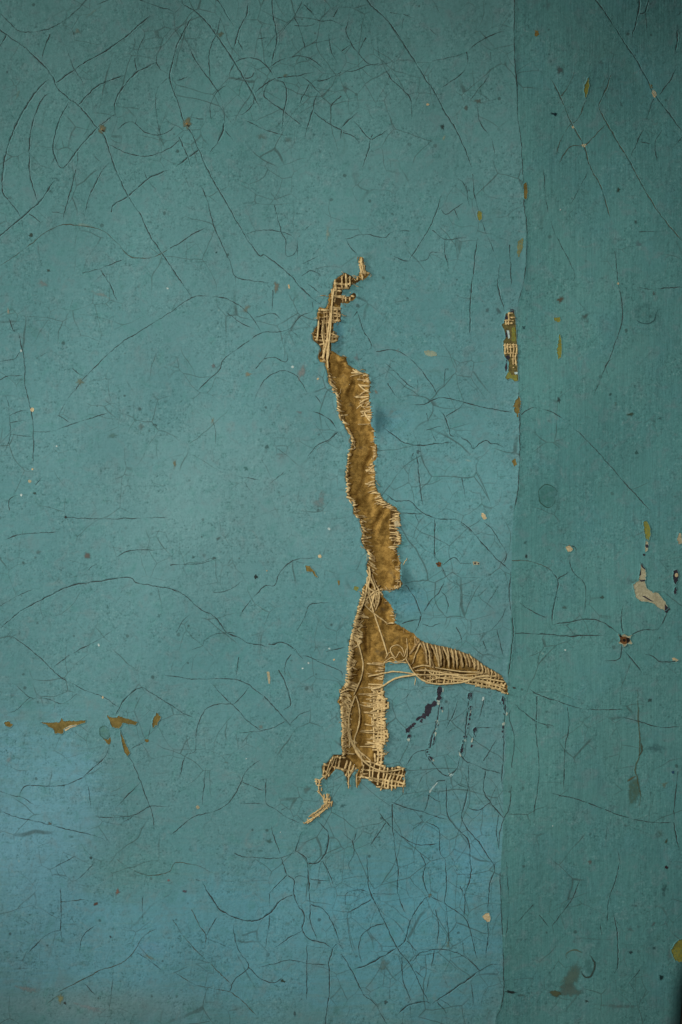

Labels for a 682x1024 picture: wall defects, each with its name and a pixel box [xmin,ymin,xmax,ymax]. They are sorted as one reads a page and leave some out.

crack [0,0,682,458]
peeling [500,309,522,418]
peeling [632,520,680,613]
crack [0,312,681,1024]
peeling [39,717,87,735]
peeling [104,712,162,758]
peeling [405,685,444,763]
peeling [459,688,508,757]